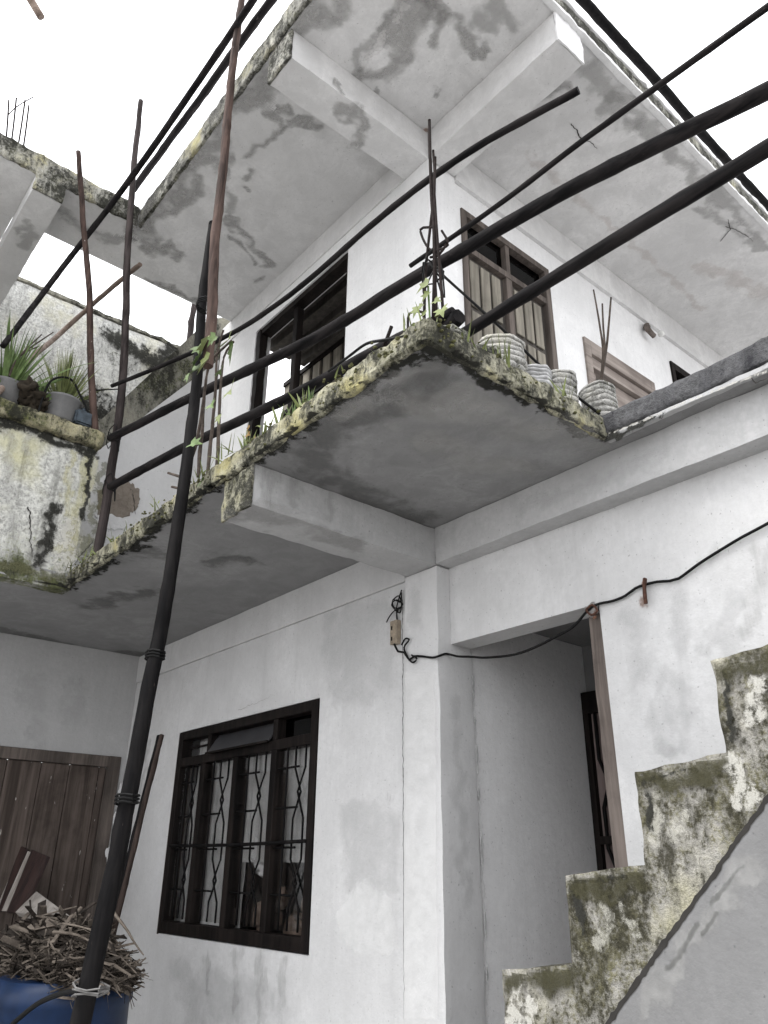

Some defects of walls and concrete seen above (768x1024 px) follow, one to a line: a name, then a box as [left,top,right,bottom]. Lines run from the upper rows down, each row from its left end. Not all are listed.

leakage [99,325,176,369]
leakage [78,385,116,421]
mould [186,339,664,514]
leakage [0,417,173,590]
peeling [94,478,140,531]
leakage [723,673,766,810]
mould [641,768,685,832]
mould [569,873,627,936]
leakage [505,984,538,1024]